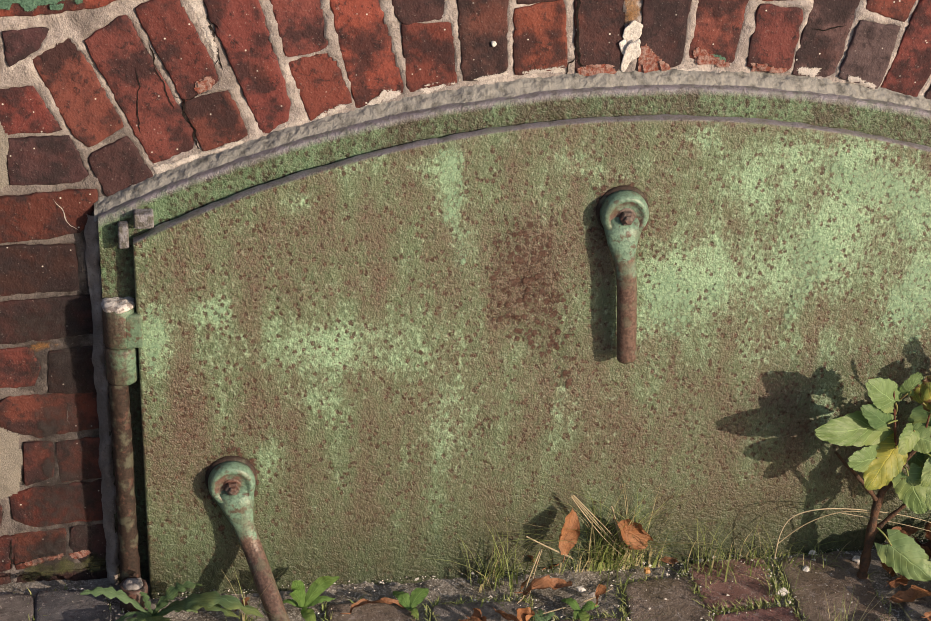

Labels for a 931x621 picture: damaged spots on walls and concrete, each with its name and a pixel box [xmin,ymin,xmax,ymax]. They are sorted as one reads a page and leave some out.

peeling [578,20,671,76]
rust [482,217,577,389]
rust [220,447,264,497]